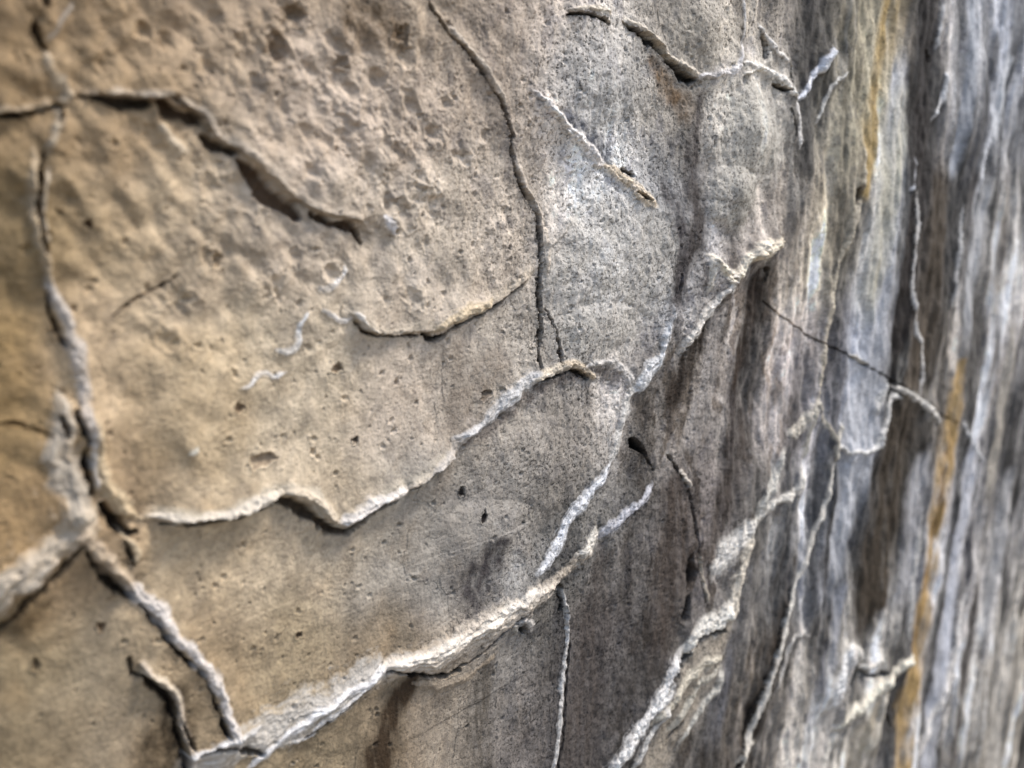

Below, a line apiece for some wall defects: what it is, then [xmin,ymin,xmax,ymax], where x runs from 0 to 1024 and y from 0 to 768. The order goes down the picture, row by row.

crack [29,0,53,51]
crack [566,0,850,150]
crack [427,0,591,383]
crack [620,167,655,202]
crack [762,143,985,464]
crack [0,548,83,632]
crack [0,409,139,540]
crack [200,746,267,760]
crack [302,582,571,768]
crack [629,445,711,625]
crack [733,461,837,768]
crack [819,510,925,731]